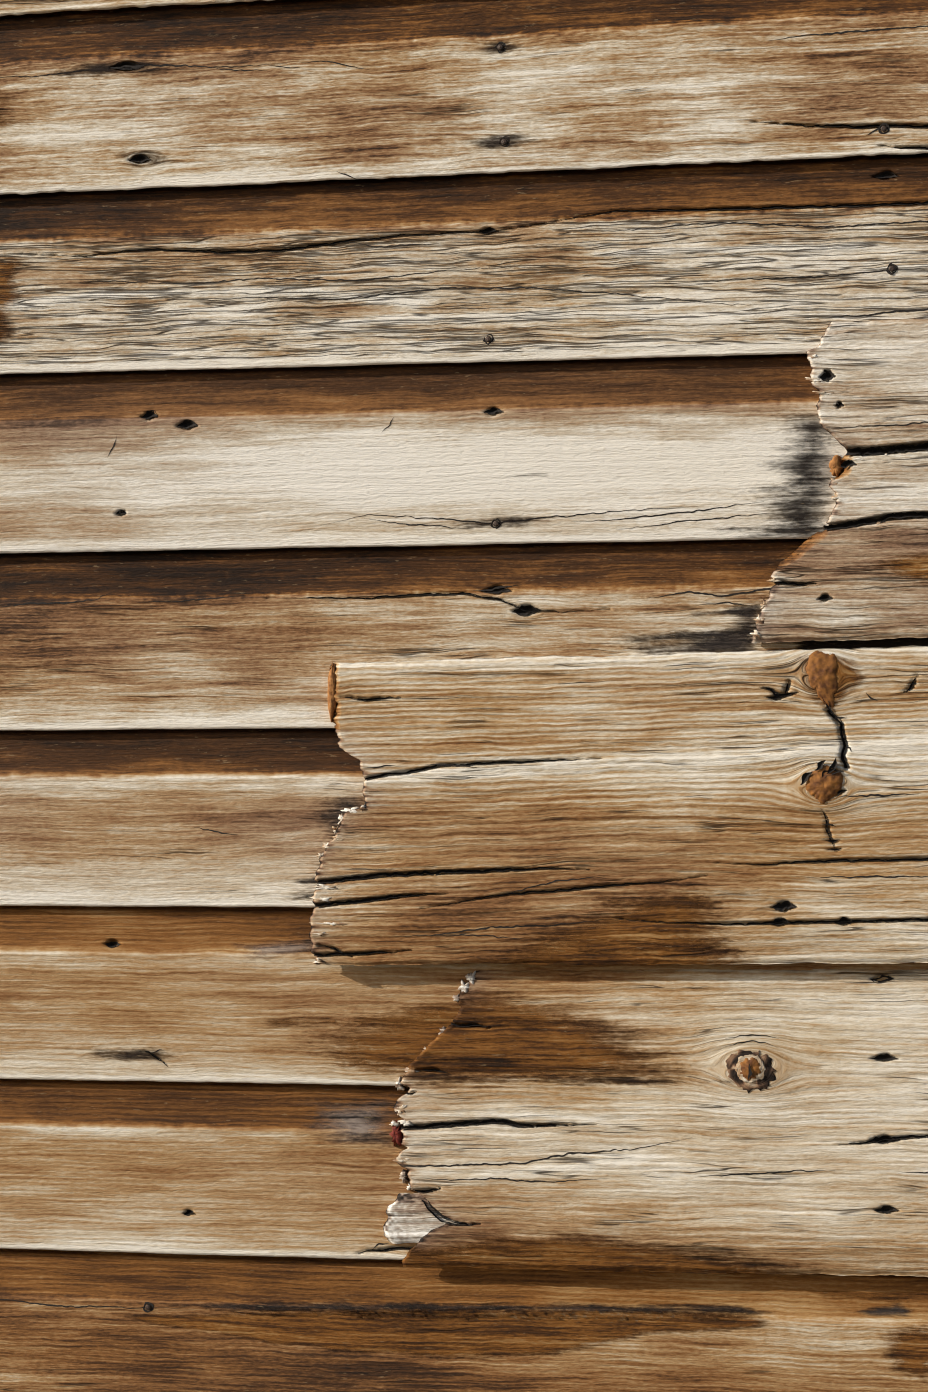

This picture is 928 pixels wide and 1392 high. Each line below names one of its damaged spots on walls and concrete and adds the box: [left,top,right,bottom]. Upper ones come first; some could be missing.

damp [725,415,835,538]
crack [298,584,601,613]
crack [649,581,812,607]
peeling [317,804,366,859]
crack [314,675,928,957]
peeling [310,883,340,903]
peeling [453,971,476,1002]
crack [451,1021,490,1029]
peeling [389,1067,419,1191]
crack [401,1069,689,1226]
crack [699,1135,928,1177]